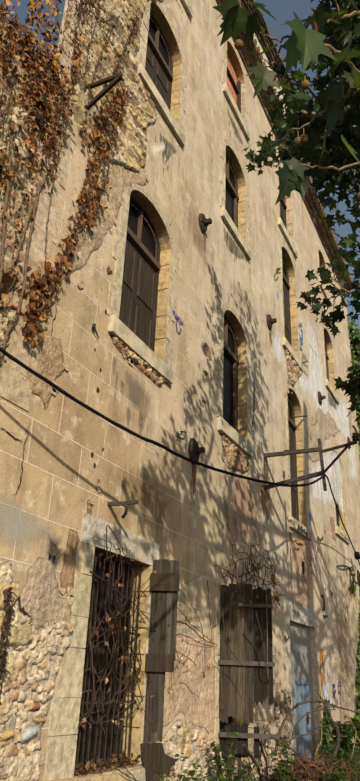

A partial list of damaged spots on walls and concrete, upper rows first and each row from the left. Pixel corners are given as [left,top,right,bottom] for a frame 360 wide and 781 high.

flaking render [62,0,169,289]
flaking render [25,334,69,409]
flaking render [284,348,309,397]
crack [0,427,29,497]
flaking render [307,408,355,462]
flaking render [288,529,319,609]
flaking render [0,529,79,781]
flaking render [152,633,292,781]